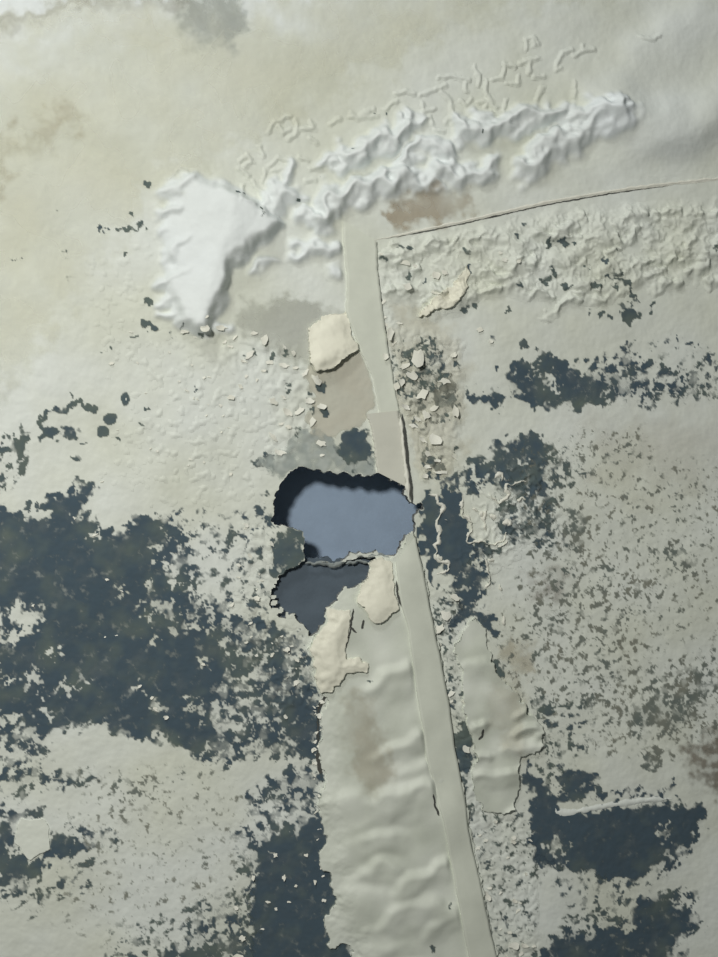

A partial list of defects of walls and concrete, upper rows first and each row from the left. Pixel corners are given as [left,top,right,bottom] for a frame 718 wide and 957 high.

crack [375,178,718,240]
leakage [0,392,120,490]
leakage [337,428,374,473]
spalling [382,266,470,483]
leakage [391,336,718,430]
leakage [0,476,351,957]
peeling [180,311,469,957]
spalling [423,568,550,957]
leakage [417,428,718,957]